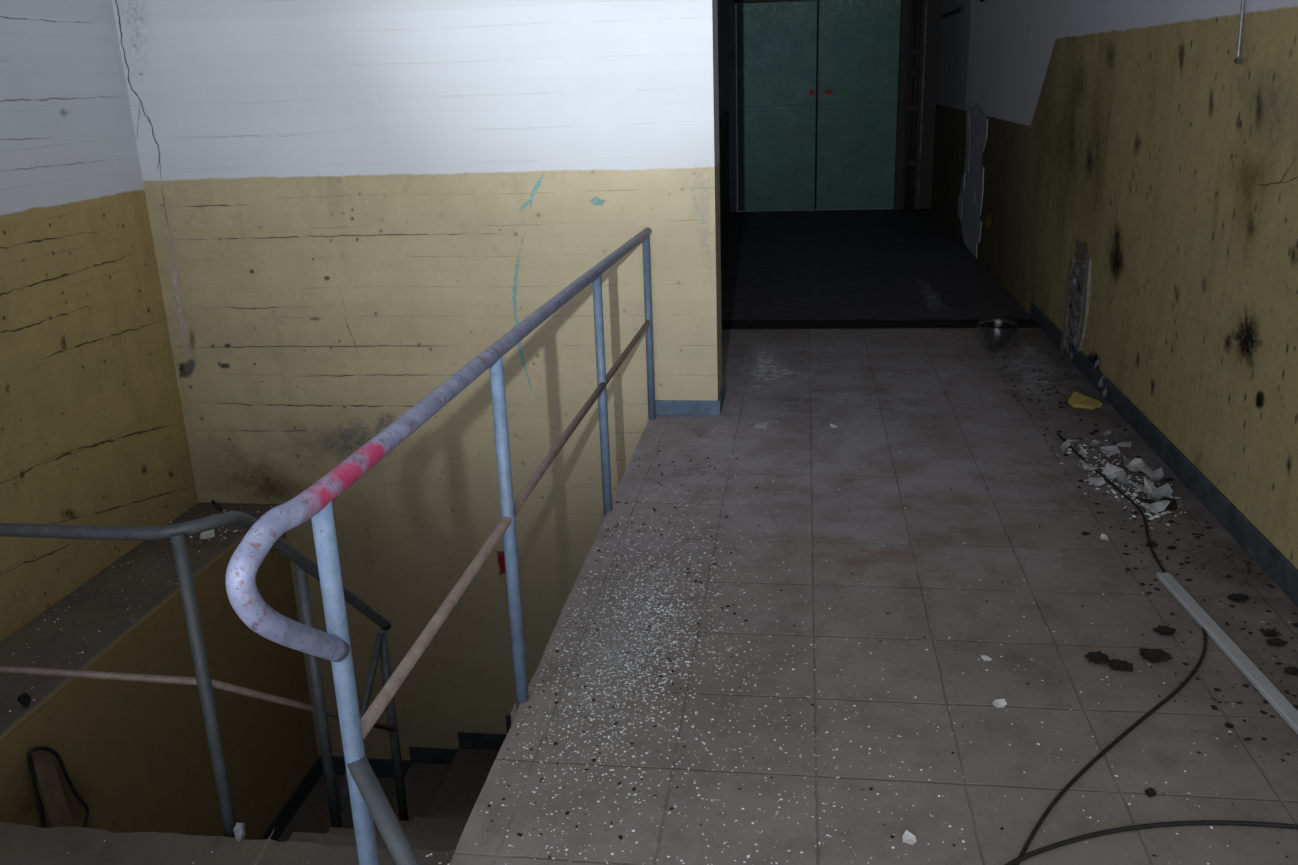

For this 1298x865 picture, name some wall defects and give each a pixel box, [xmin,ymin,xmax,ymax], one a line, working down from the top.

crack [0,0,504,251]
peeling [957,105,988,259]
crack [0,230,137,296]
crack [0,304,453,484]
spalling [1061,242,1107,397]
leakage [1225,317,1257,360]